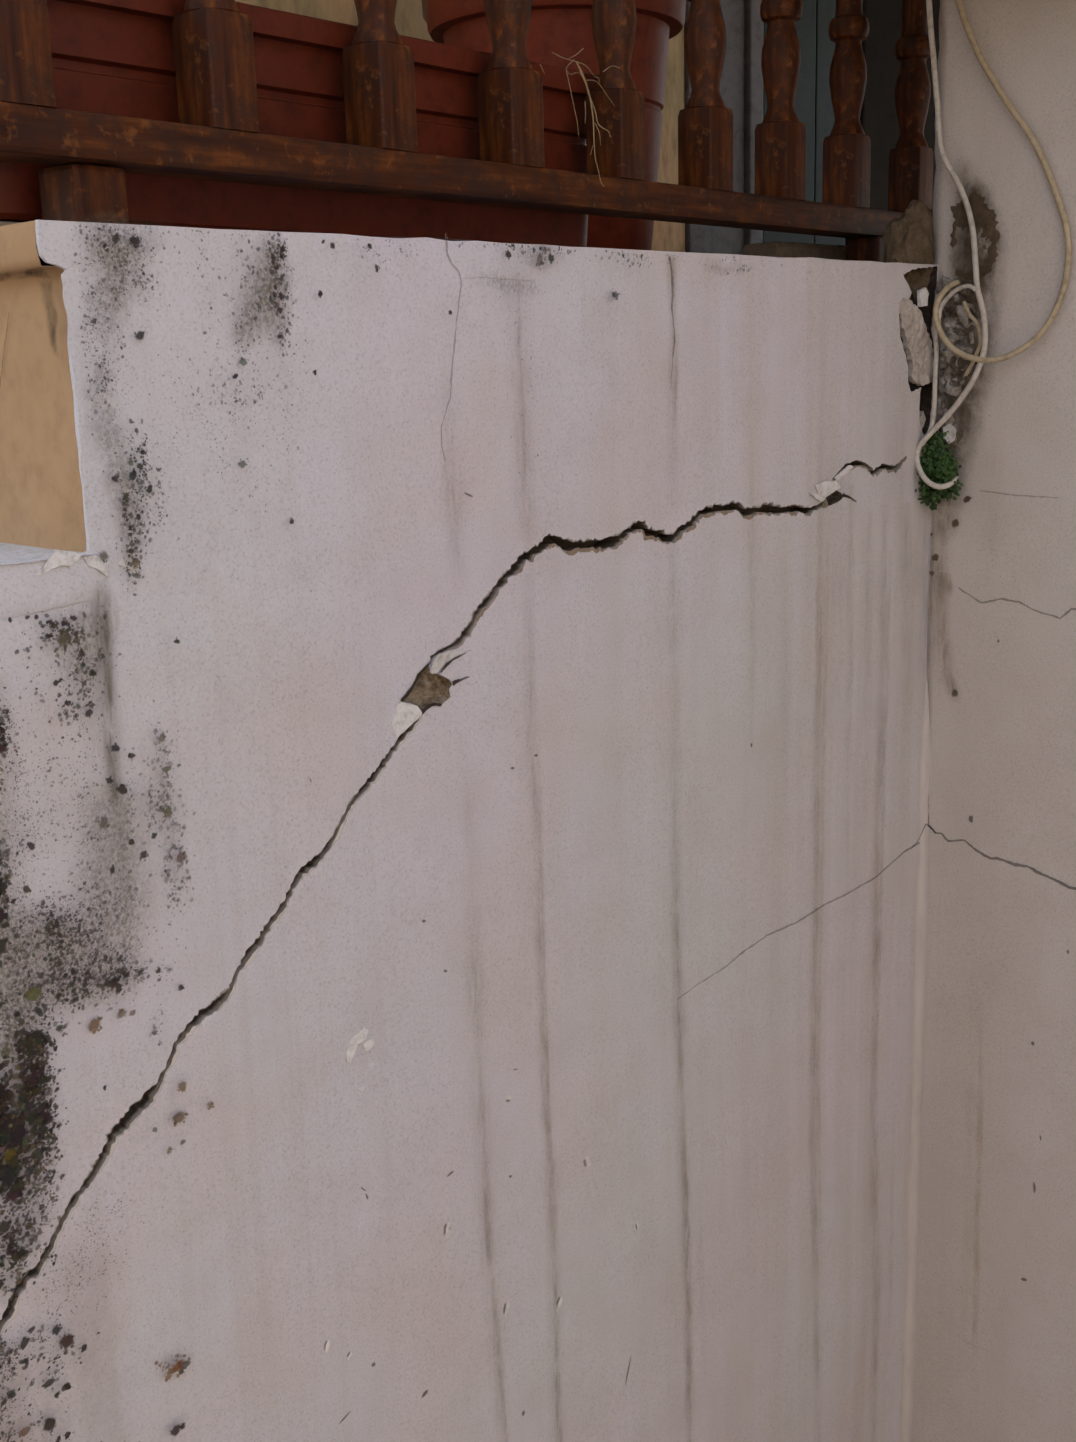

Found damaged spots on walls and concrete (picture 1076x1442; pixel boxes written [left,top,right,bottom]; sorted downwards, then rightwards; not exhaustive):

mould [71,225,308,596]
spalling [392,649,472,738]
crack [430,456,907,658]
spalling [899,184,993,487]
crack [911,821,1076,890]
damp [0,605,189,1442]
crack [0,715,422,1336]